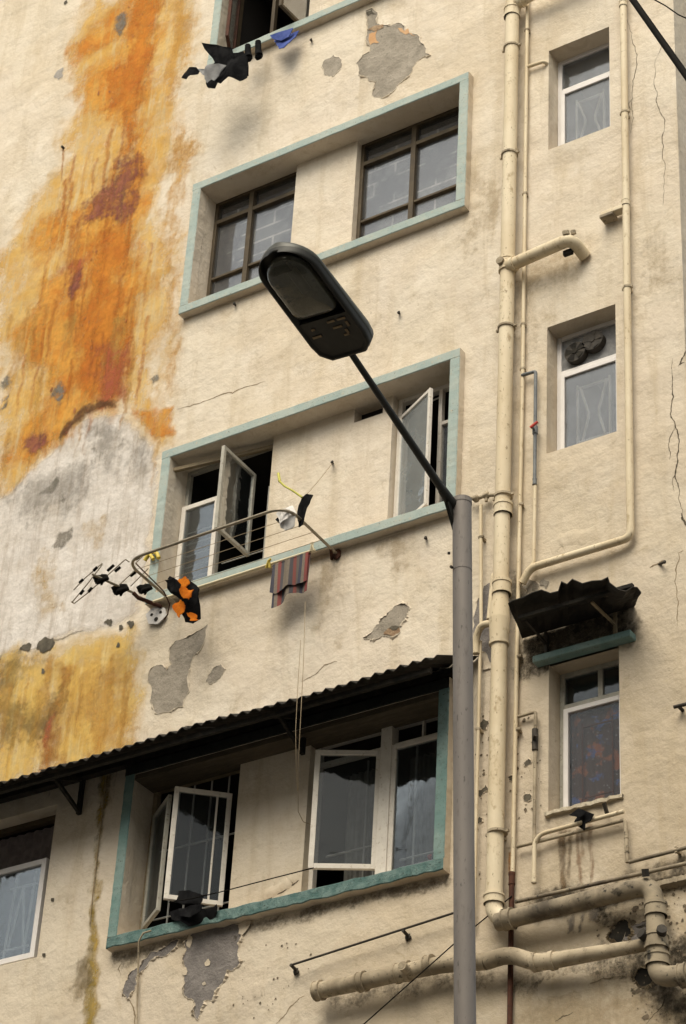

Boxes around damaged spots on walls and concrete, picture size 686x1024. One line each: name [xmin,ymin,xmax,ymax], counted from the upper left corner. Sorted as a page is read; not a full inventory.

peeling [321,55,342,77]
peeling [356,7,431,99]
crack [627,21,665,201]
corrosion [0,0,191,491]
crack [180,382,261,409]
crack [668,351,686,526]
spalling [363,601,411,642]
peeling [147,624,208,715]
peeling [206,664,226,684]
damp [79,853,99,1024]
spalling [121,920,251,1021]